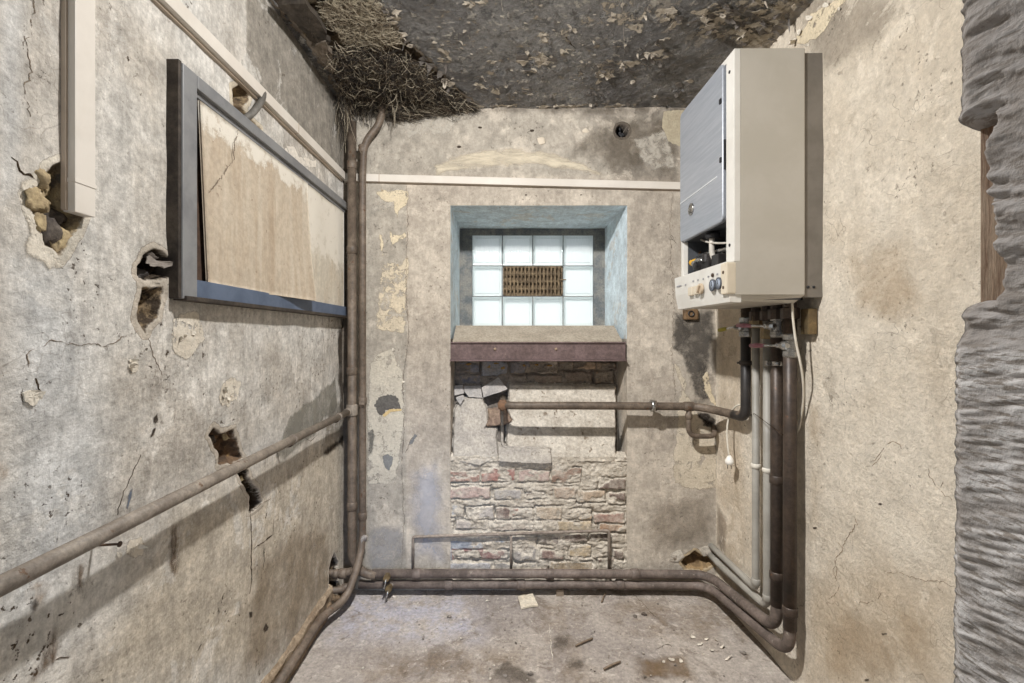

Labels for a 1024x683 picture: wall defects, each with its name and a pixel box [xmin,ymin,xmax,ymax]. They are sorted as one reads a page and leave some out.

spalling [269,0,846,152]
flaking render [17,153,91,269]
peeling [373,189,409,217]
flaking render [130,242,205,359]
peeling [376,258,409,333]
crack [26,333,162,375]
peeling [367,348,405,484]
spalling [454,384,482,404]
water stain [673,312,714,399]
spalling [205,422,265,517]
crack [250,498,274,590]
flaking render [669,546,716,572]